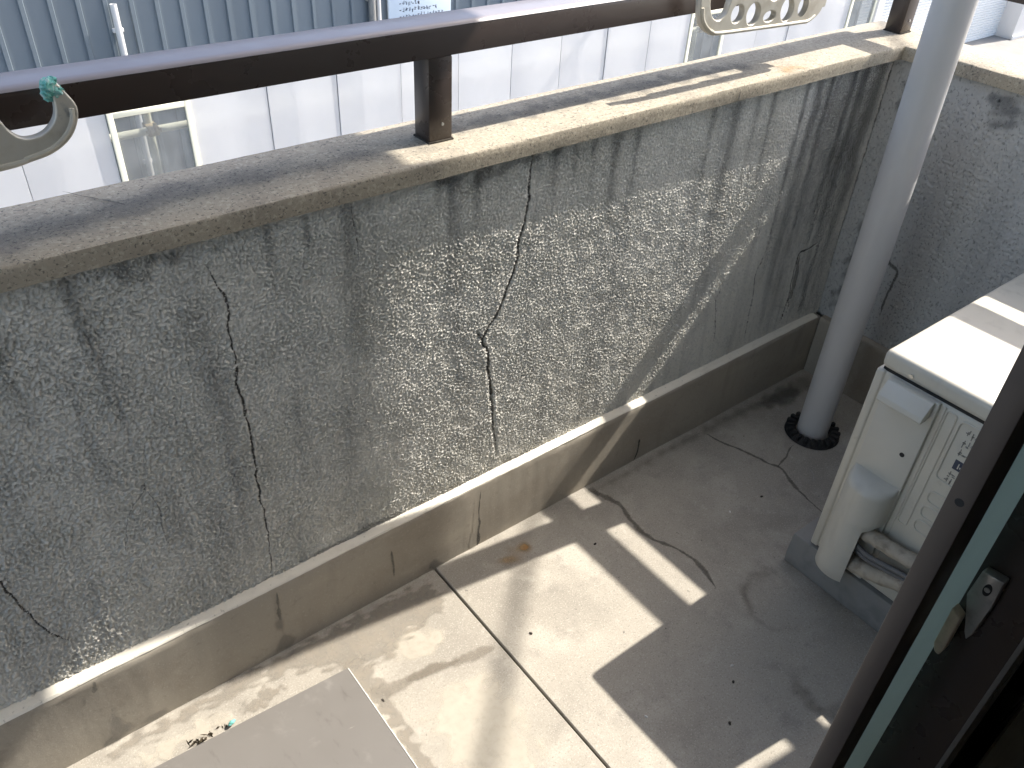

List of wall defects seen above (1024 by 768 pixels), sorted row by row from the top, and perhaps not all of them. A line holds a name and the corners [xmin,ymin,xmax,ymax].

crack [477,164,532,450]
crack [210,272,272,567]
crack [711,436,822,512]
crack [593,490,714,585]
crack [0,581,68,640]